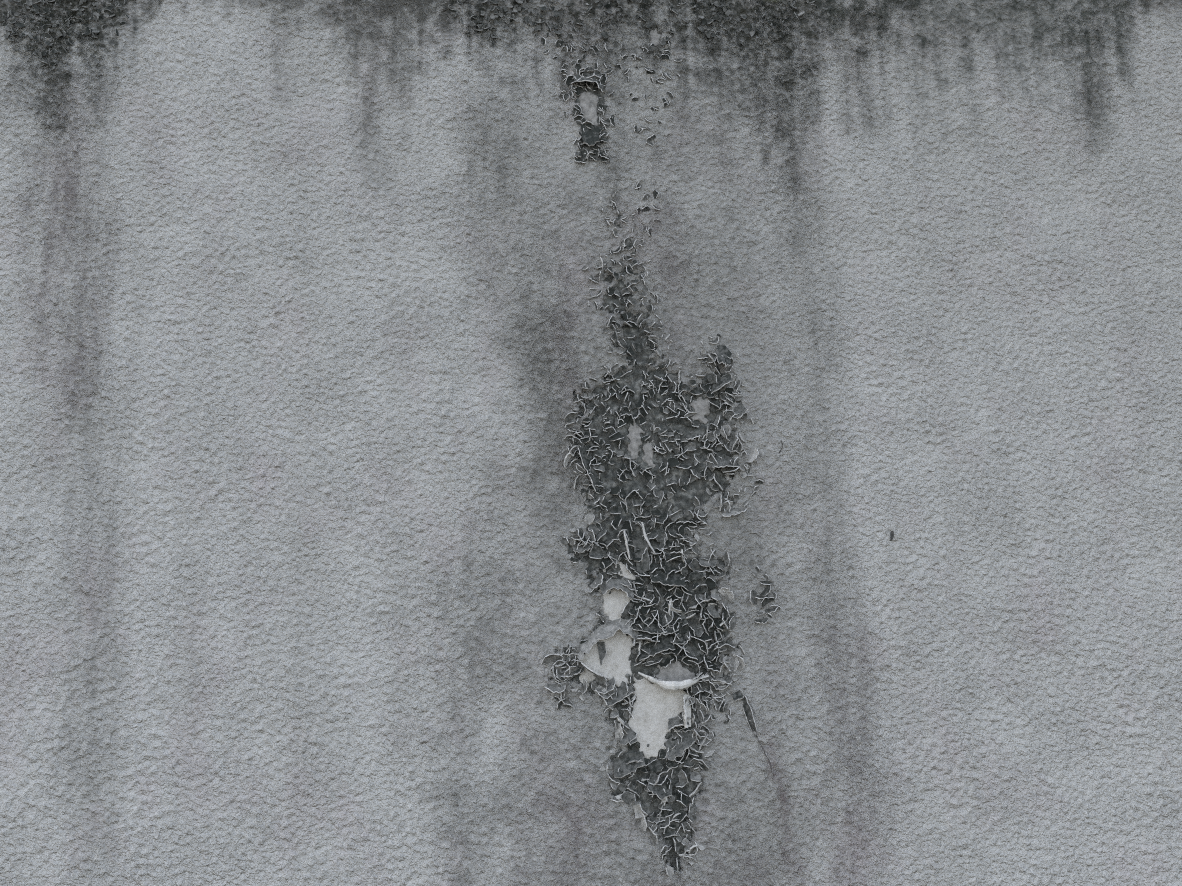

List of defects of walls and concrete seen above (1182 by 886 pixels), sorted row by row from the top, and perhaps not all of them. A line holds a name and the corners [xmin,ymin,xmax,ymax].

peeling [441,0,817,163]
peeling [541,182,781,878]